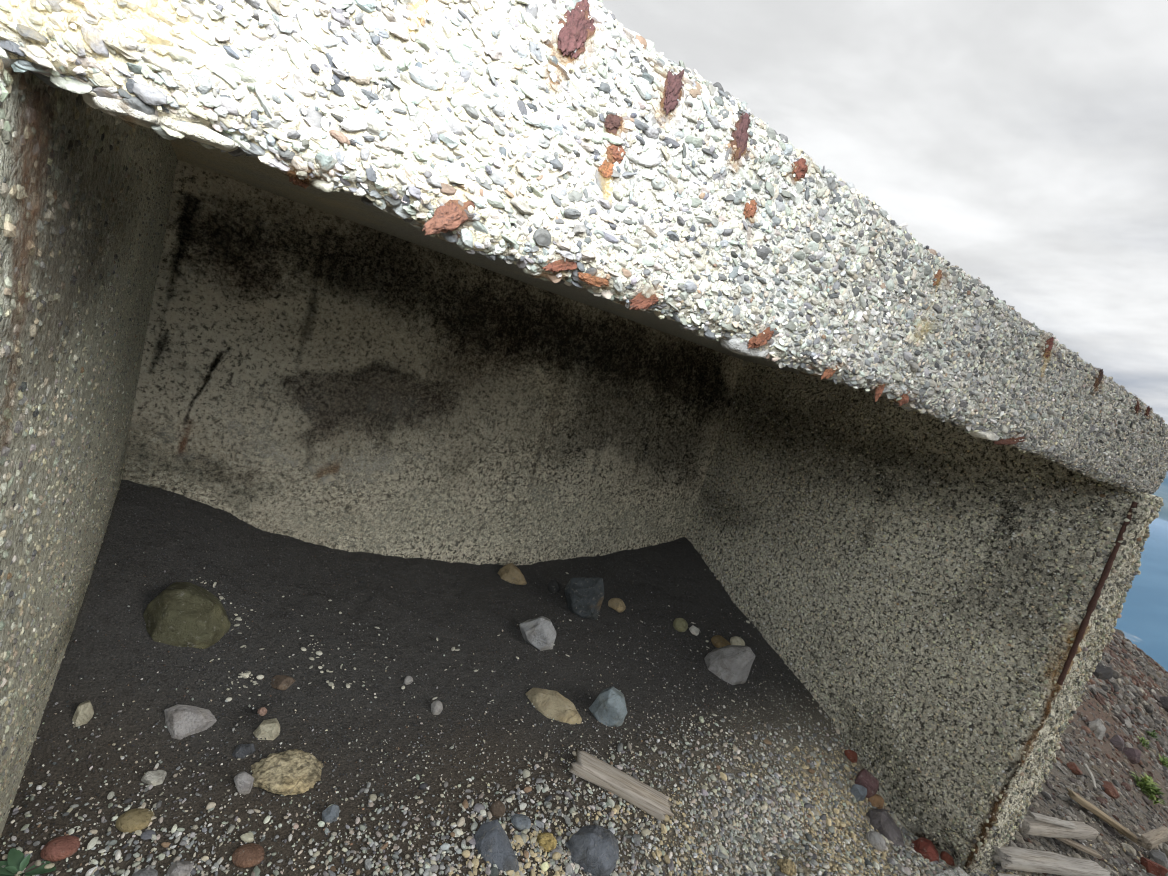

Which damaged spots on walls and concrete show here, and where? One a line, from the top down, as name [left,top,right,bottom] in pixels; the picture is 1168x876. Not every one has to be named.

rust [557,0,596,62]
rust [660,69,685,115]
rust [598,111,626,179]
rust [730,112,751,164]
rust [791,158,808,181]
rust [422,199,475,236]
rust [743,200,757,219]
rust [542,259,609,287]
rust [629,292,663,311]
water stain [168,194,947,503]
rust [747,327,777,349]
crack [179,347,230,456]